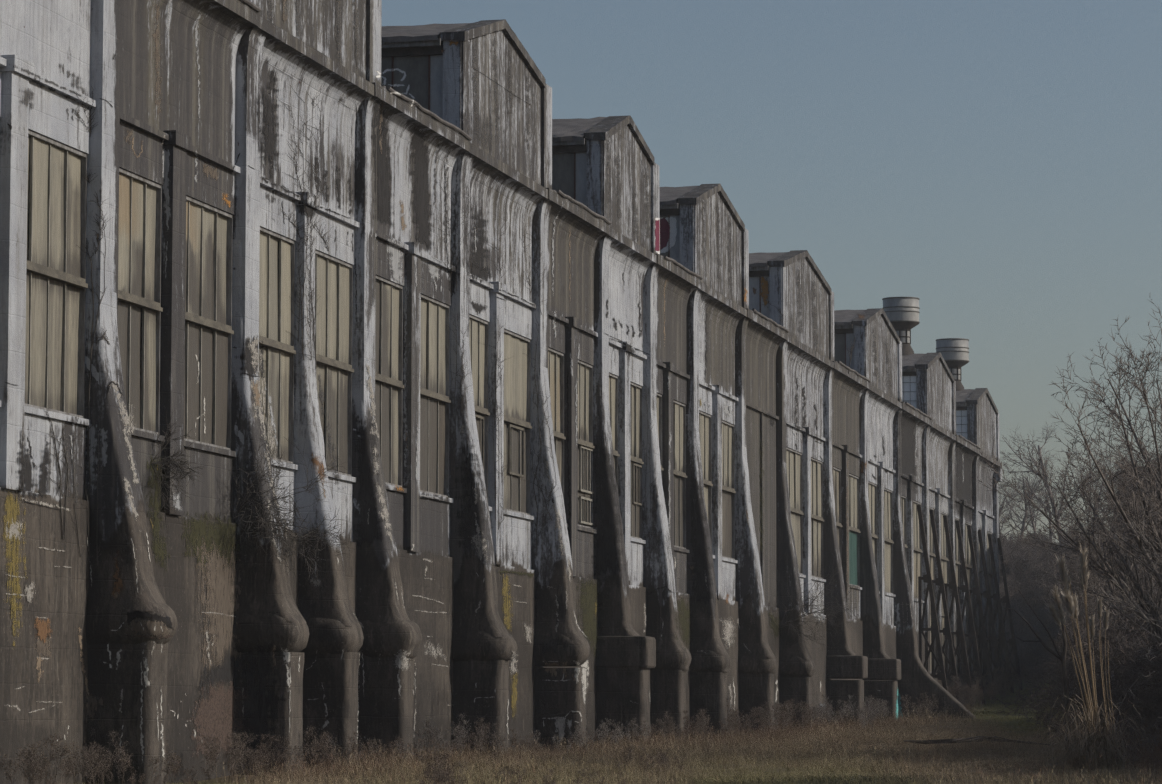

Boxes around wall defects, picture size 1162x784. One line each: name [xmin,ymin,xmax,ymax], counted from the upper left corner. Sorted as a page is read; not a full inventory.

water stain [260,145,299,224]
water stain [433,145,458,296]
peeling [85,423,108,495]
peeling [111,380,139,517]